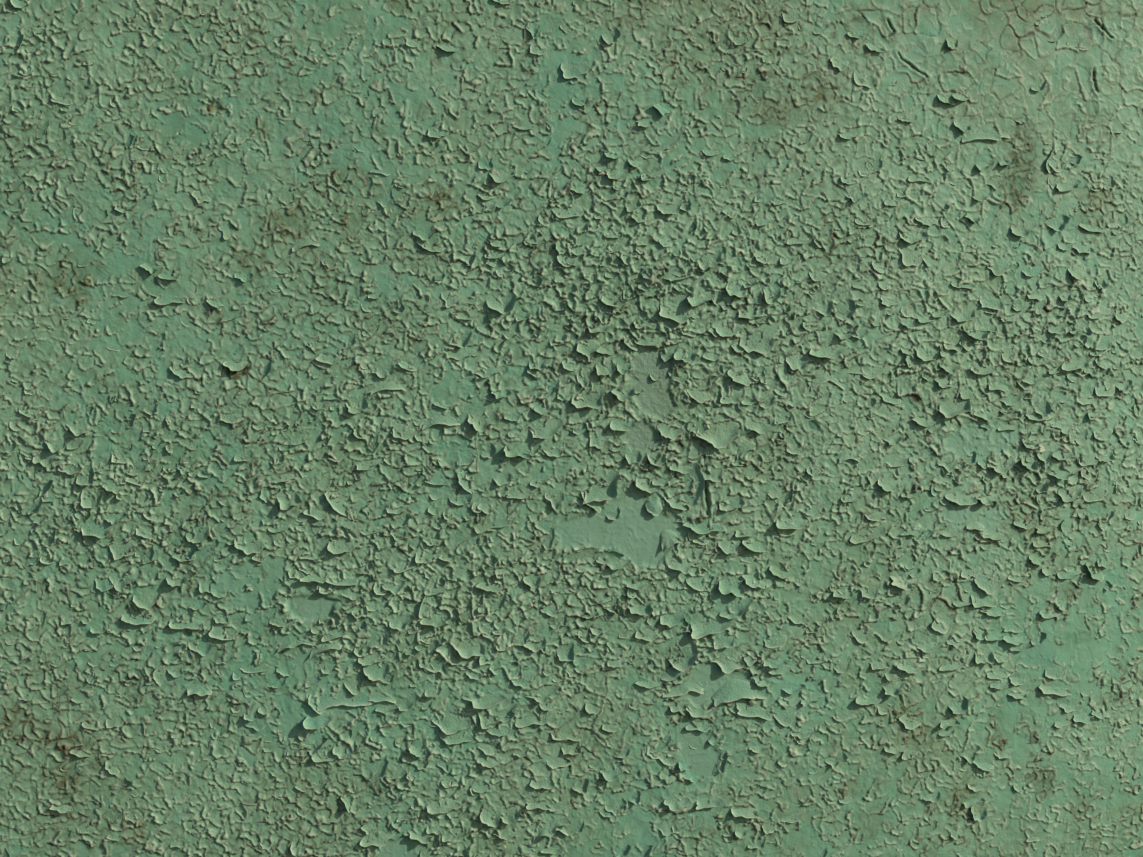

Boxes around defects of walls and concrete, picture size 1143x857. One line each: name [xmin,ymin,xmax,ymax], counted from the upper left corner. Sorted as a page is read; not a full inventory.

peeling [526,22,547,55]
peeling [561,60,590,79]
peeling [830,57,875,88]
peeling [954,122,1011,142]
peeling [841,155,964,225]
peeling [1029,142,1118,198]
peeling [0,406,231,566]
peeling [58,104,848,857]
peeling [938,696,969,737]
peeling [884,745,915,760]
peeling [958,745,1014,822]
peeling [50,805,73,813]